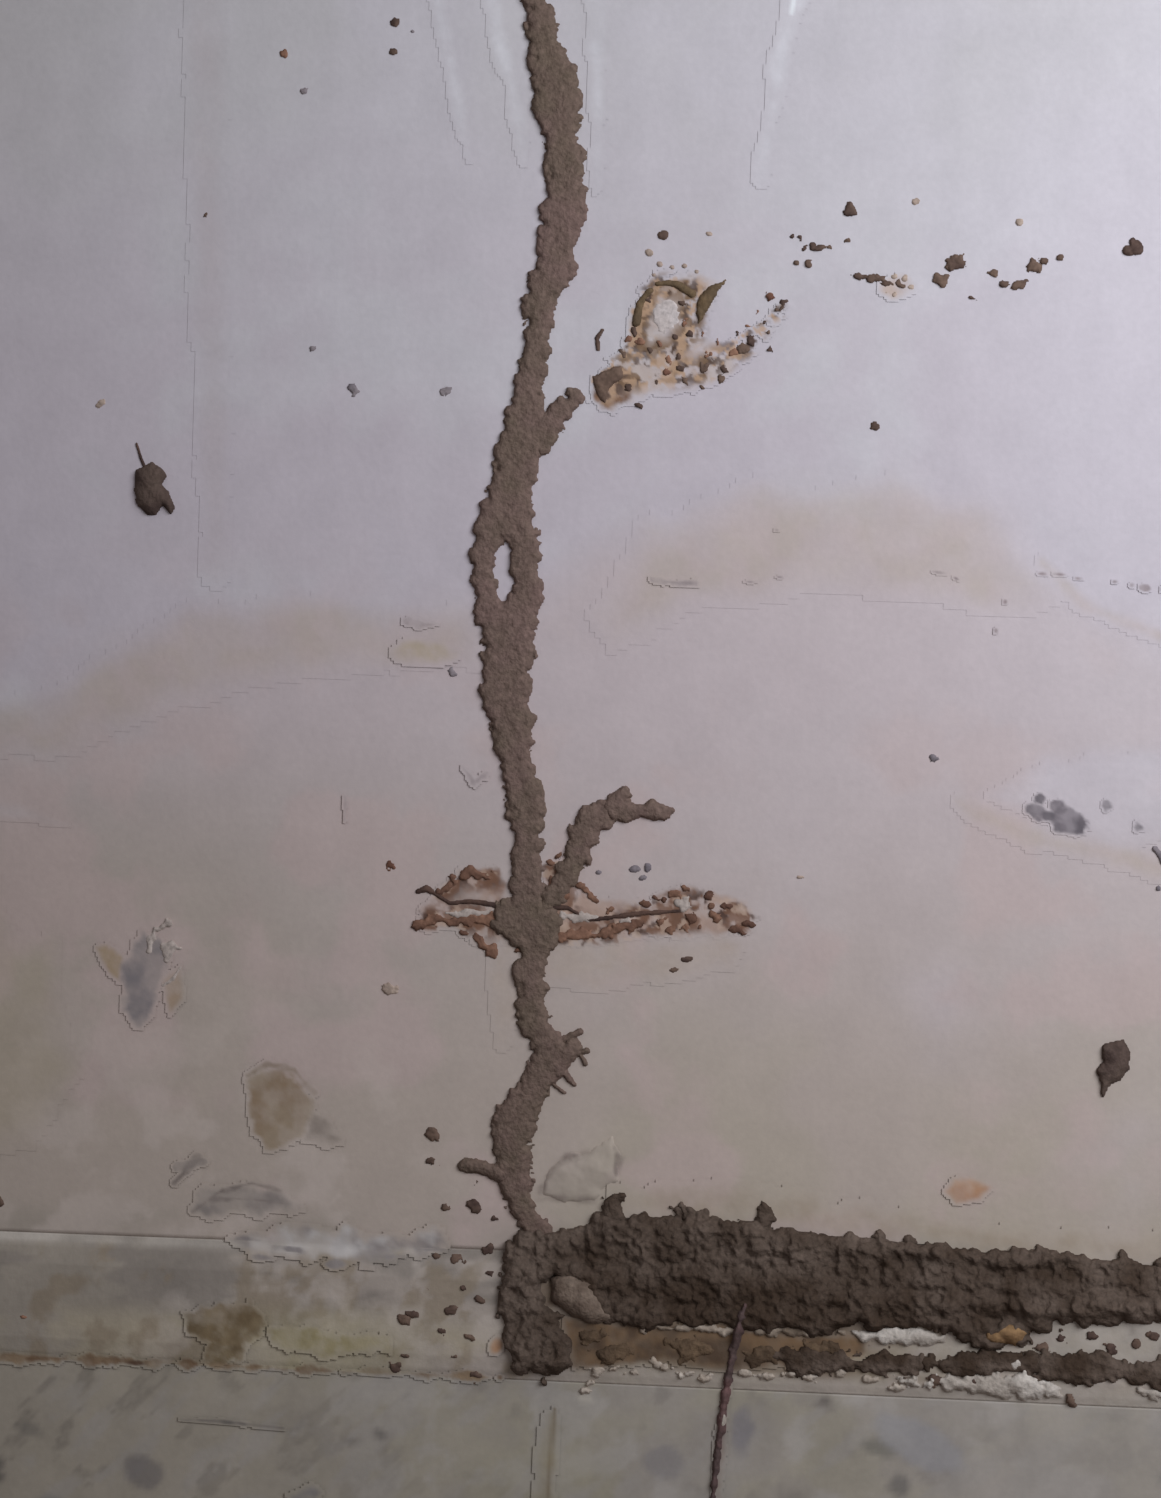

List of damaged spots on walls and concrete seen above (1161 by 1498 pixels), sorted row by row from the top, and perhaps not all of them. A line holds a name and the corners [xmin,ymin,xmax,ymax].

peeling [586,230,790,416]